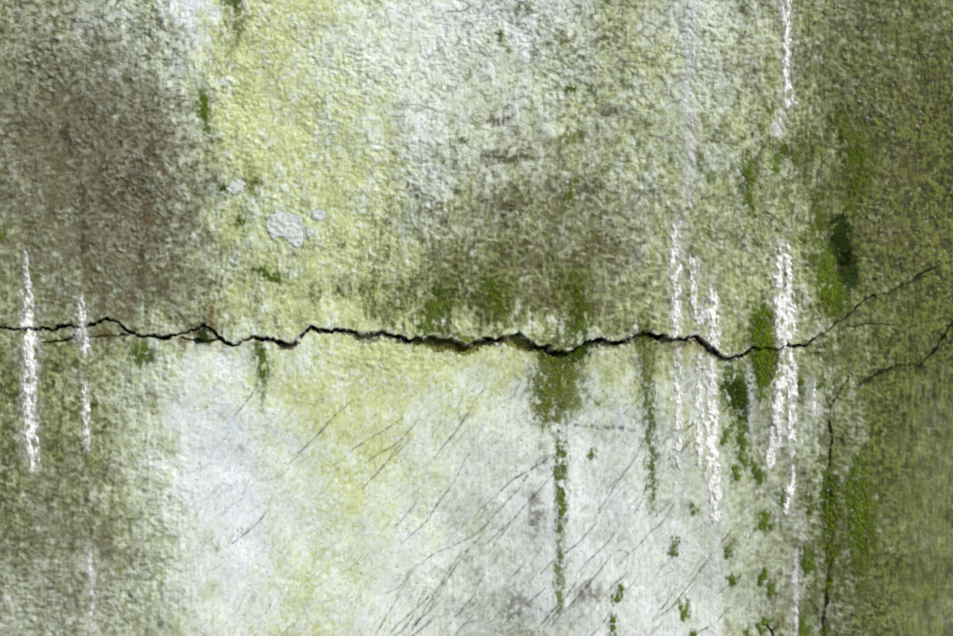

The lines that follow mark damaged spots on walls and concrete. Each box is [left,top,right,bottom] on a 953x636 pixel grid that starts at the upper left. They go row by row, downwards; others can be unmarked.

water stain [684,0,716,206]
water stain [759,0,799,172]
efflorescence [19,251,40,471]
efflorescence [76,296,90,354]
efflorescence [82,382,90,450]
crack [0,267,936,362]
water stain [670,221,751,636]
efflorescence [766,240,799,515]
water stain [810,189,847,317]
crack [827,322,953,528]
water stain [552,430,568,613]
crack [821,551,832,636]